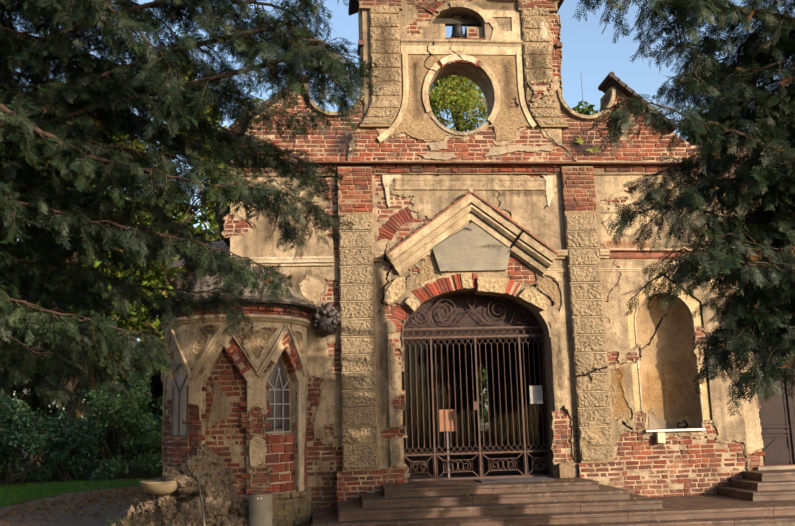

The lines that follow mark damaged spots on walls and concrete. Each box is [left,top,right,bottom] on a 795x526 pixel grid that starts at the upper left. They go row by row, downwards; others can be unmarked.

spalling [526,14,563,103]
spalling [347,124,578,162]
spalling [373,174,455,250]
crack [376,250,423,315]
spalling [406,252,445,287]
crack [601,242,623,323]
spalling [184,324,216,376]
spalling [228,326,278,378]
crack [575,313,668,382]
spalling [288,331,342,518]
spalling [551,406,579,465]
spalling [607,344,751,497]